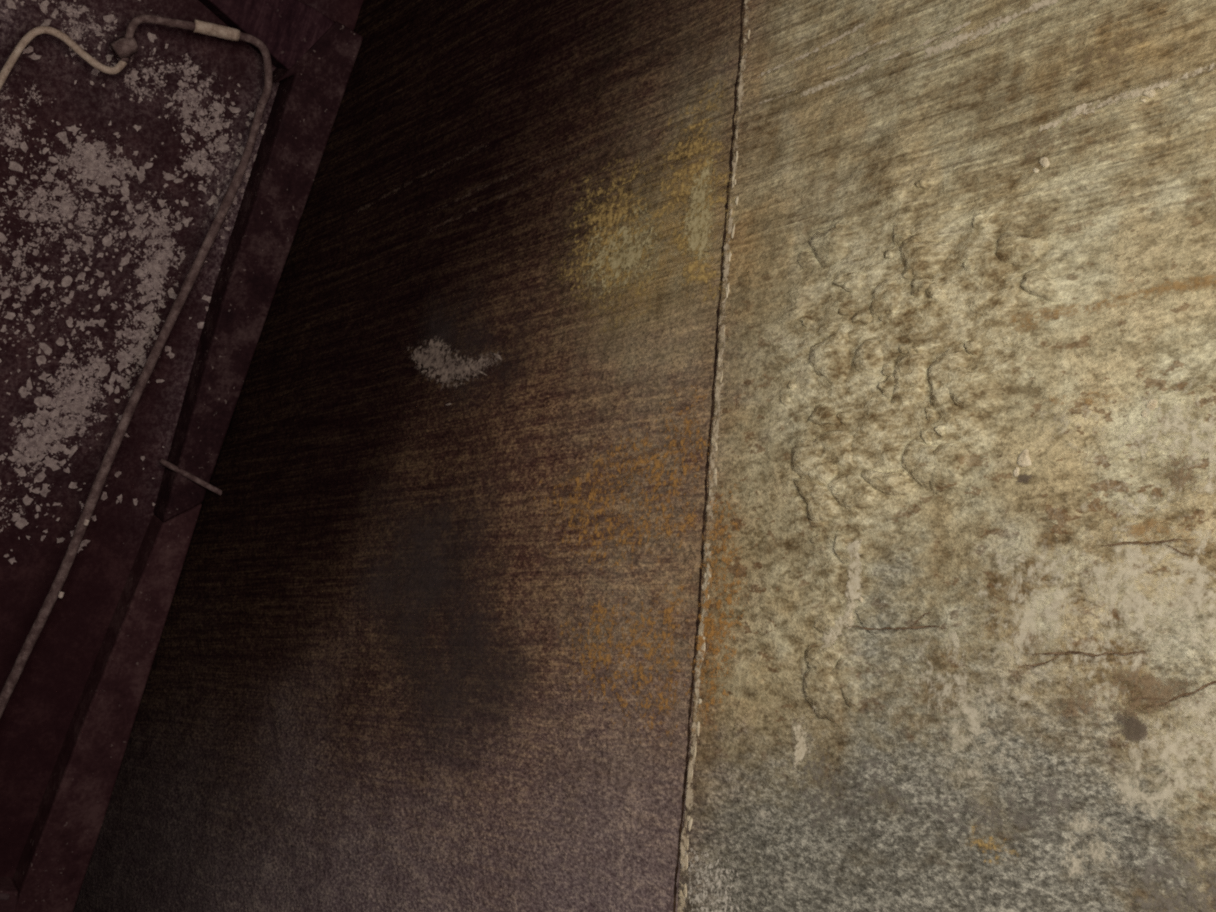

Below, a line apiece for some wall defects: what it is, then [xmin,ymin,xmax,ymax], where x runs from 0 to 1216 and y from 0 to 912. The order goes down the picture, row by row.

rust [561,83,727,310]
rust [534,396,709,569]
rust [561,491,747,728]
crack [1023,650,1151,666]
crack [1126,681,1216,712]